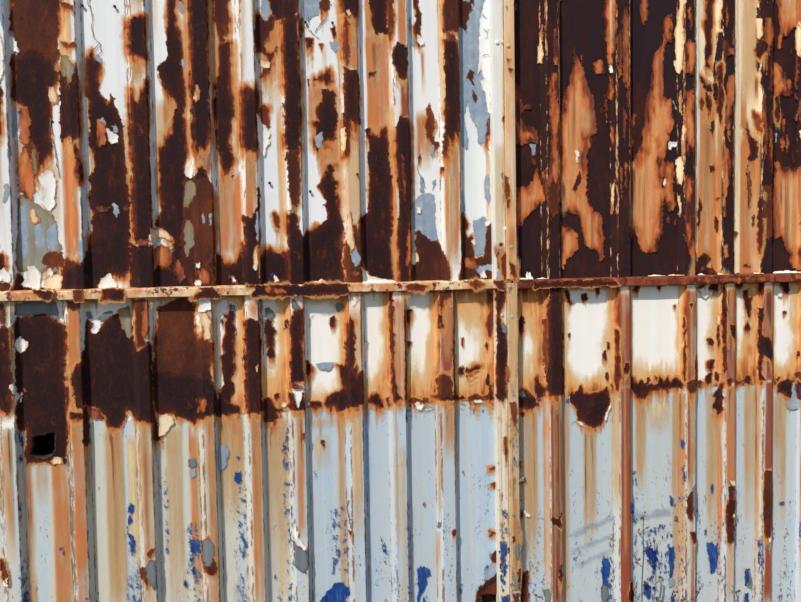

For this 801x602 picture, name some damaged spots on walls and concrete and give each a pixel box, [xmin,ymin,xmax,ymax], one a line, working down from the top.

peeling [0,301,59,402]
peeling [0,104,63,290]
corrosion [0,0,519,602]
peeling [401,153,438,268]
peeling [446,0,490,150]
peeling [464,216,502,280]
corrosion [631,167,640,211]
corrosion [690,0,729,276]
corrosion [734,0,801,274]